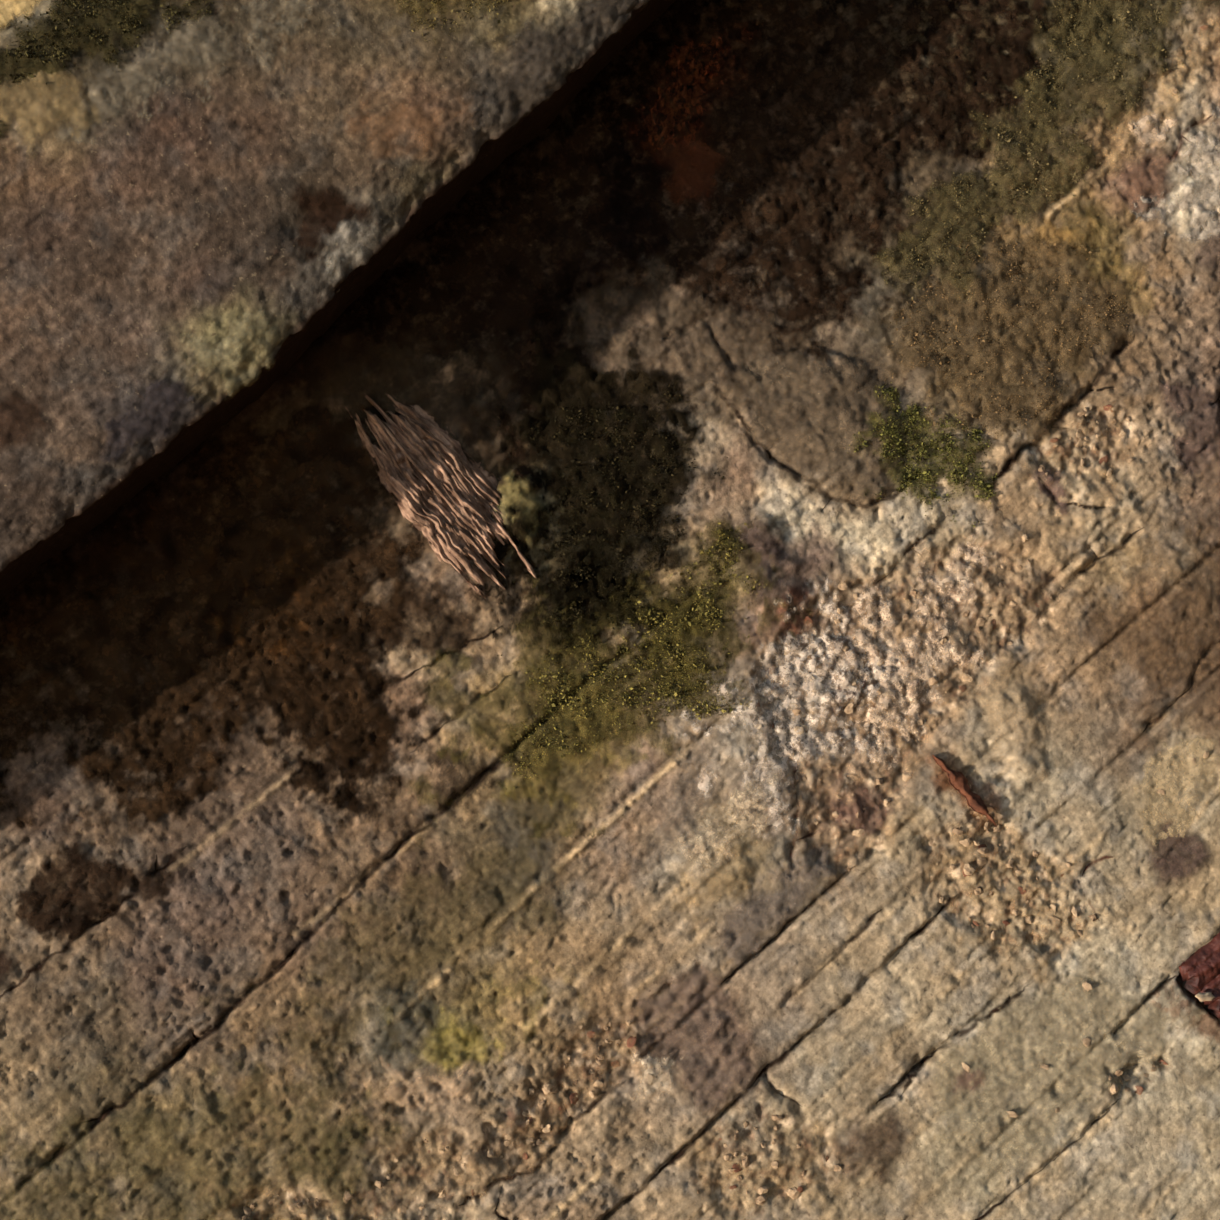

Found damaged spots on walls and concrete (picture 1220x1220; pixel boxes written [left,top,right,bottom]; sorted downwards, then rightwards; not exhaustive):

leakage [0,394,44,447]
leakage [102,381,194,462]
leakage [0,407,431,833]
leakage [546,569,666,661]
leakage [59,909,93,937]
crack [0,642,643,1220]
crack [721,866,855,984]
crack [803,910,881,987]
crack [904,895,957,945]
crack [732,1038,802,1107]
crack [602,1128,707,1220]